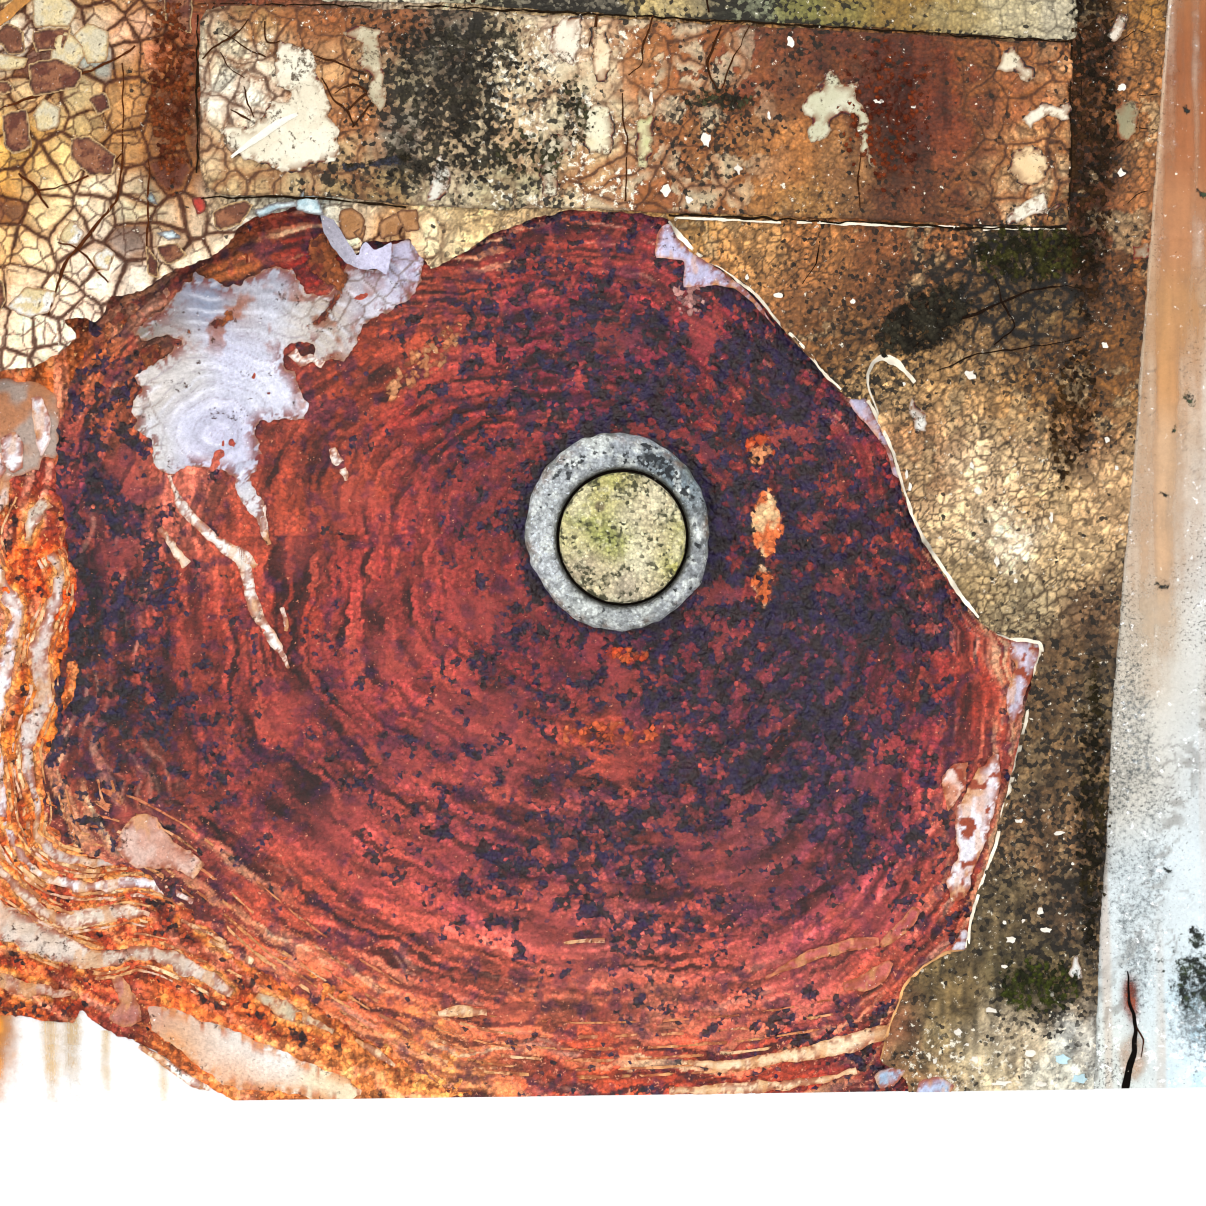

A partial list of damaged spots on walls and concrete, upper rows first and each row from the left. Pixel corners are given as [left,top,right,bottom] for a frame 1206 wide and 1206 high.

corrosion [147,2,196,196]
peeling [131,232,424,545]
peeling [219,41,340,173]
water stain [342,21,596,193]
water stain [968,0,1119,490]
corrosion [1139,0,1206,645]
peeling [0,378,242,1027]
corrosion [0,207,1033,1101]
peeling [942,754,1002,901]
water stain [1074,657,1172,962]
crack [1121,971,1144,1089]
water stain [1119,890,1206,1055]